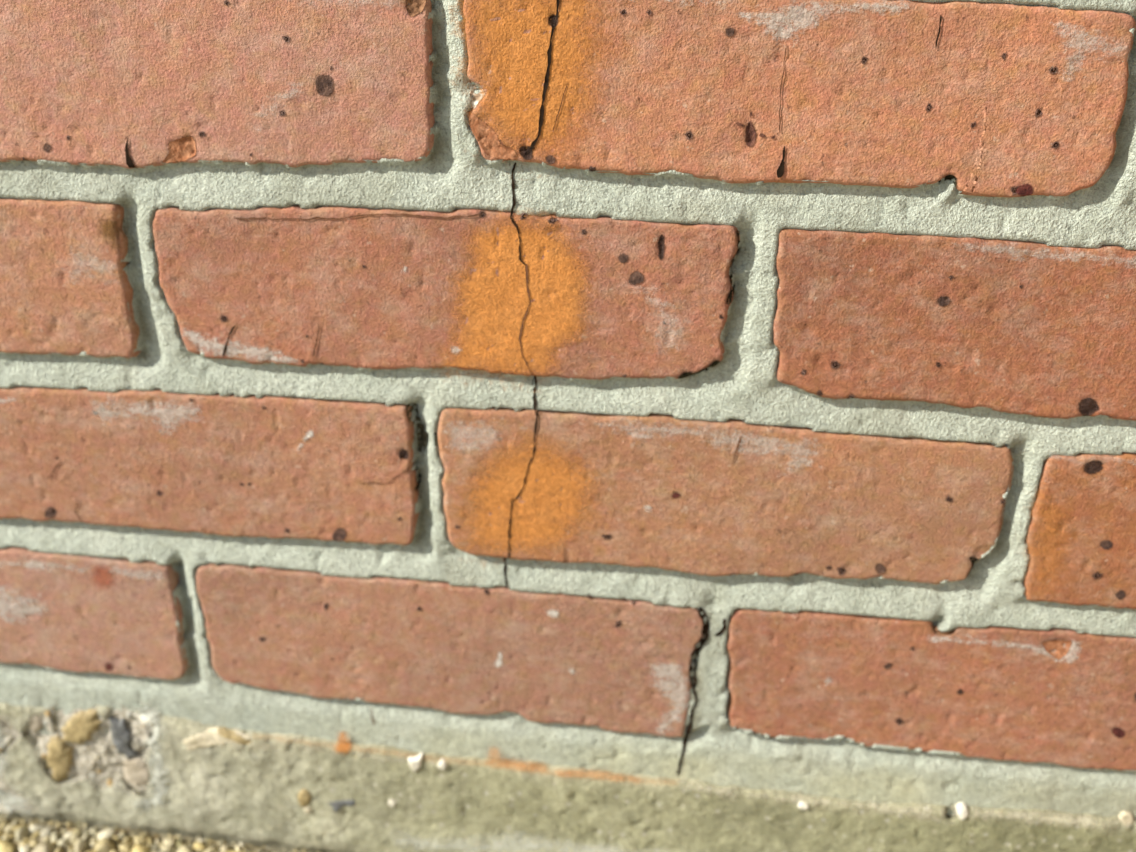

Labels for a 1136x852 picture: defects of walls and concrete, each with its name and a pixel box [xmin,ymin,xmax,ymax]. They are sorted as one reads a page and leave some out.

crack [235,212,481,220]
corrosion [445,225,587,375]
crack [503,0,568,588]
crack [361,467,410,484]
corrosion [469,443,591,551]
crack [677,607,727,776]
spalling [0,707,156,811]